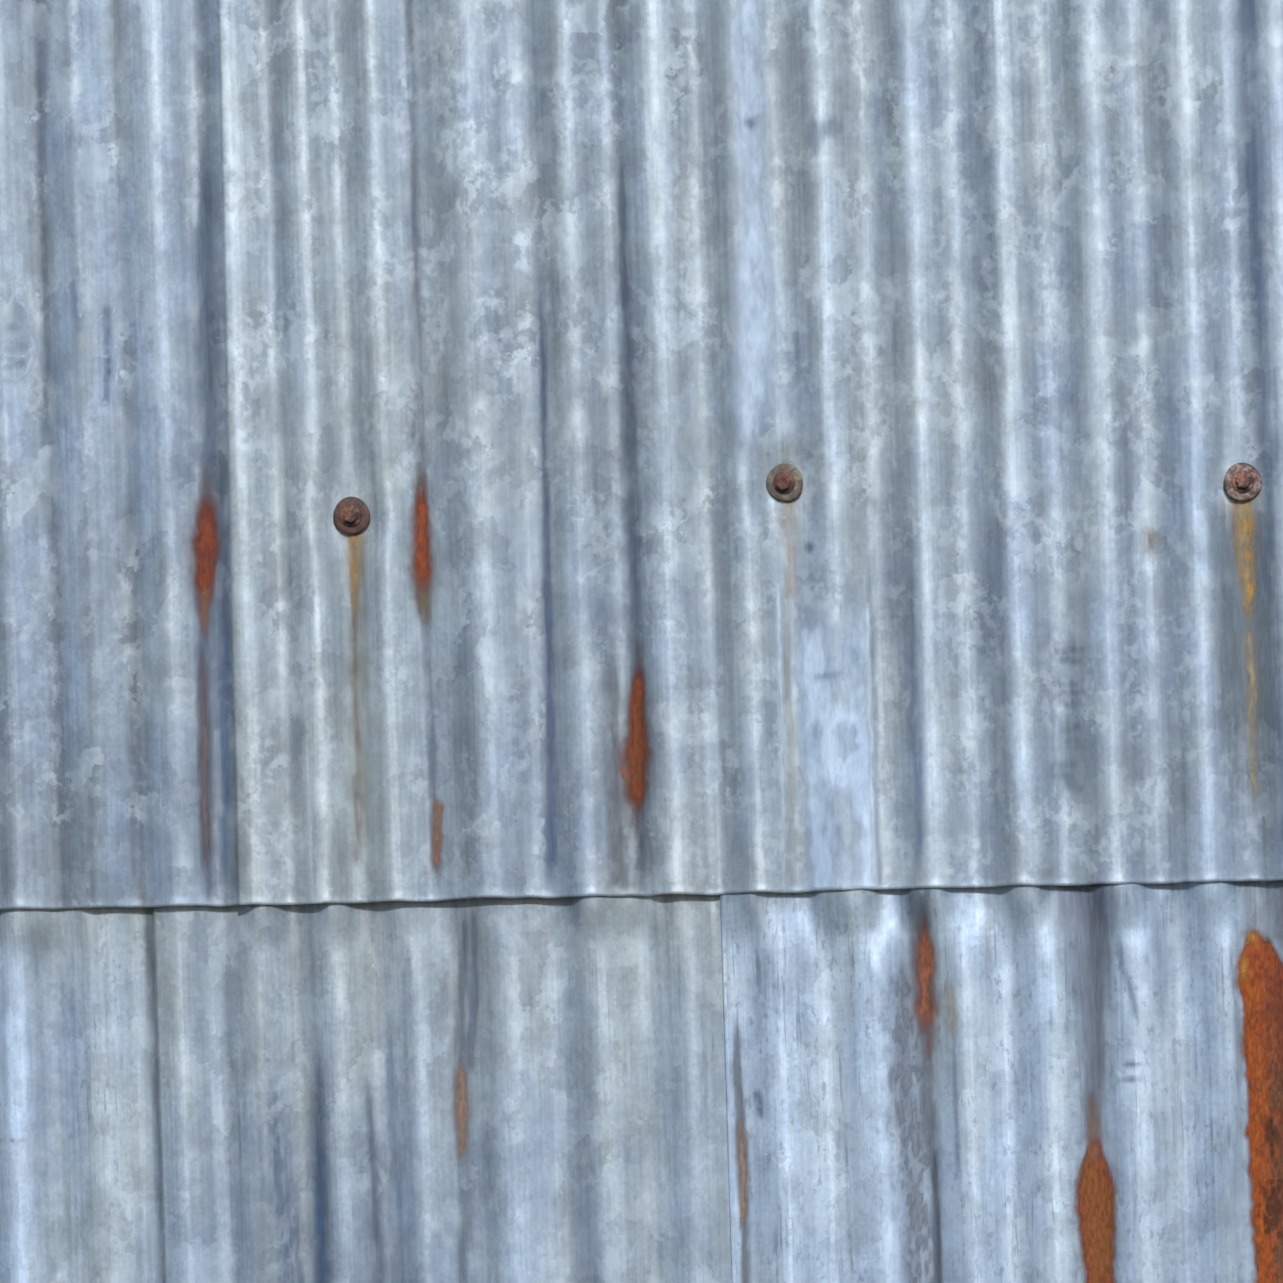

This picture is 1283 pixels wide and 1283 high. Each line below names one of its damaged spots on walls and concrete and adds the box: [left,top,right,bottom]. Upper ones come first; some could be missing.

corrosion [193,485,218,619]
corrosion [413,480,430,617]
corrosion [621,655,647,817]
corrosion [433,801,443,865]
corrosion [917,931,954,1054]
corrosion [1238,933,1283,1283]
corrosion [1076,1106,1116,1283]